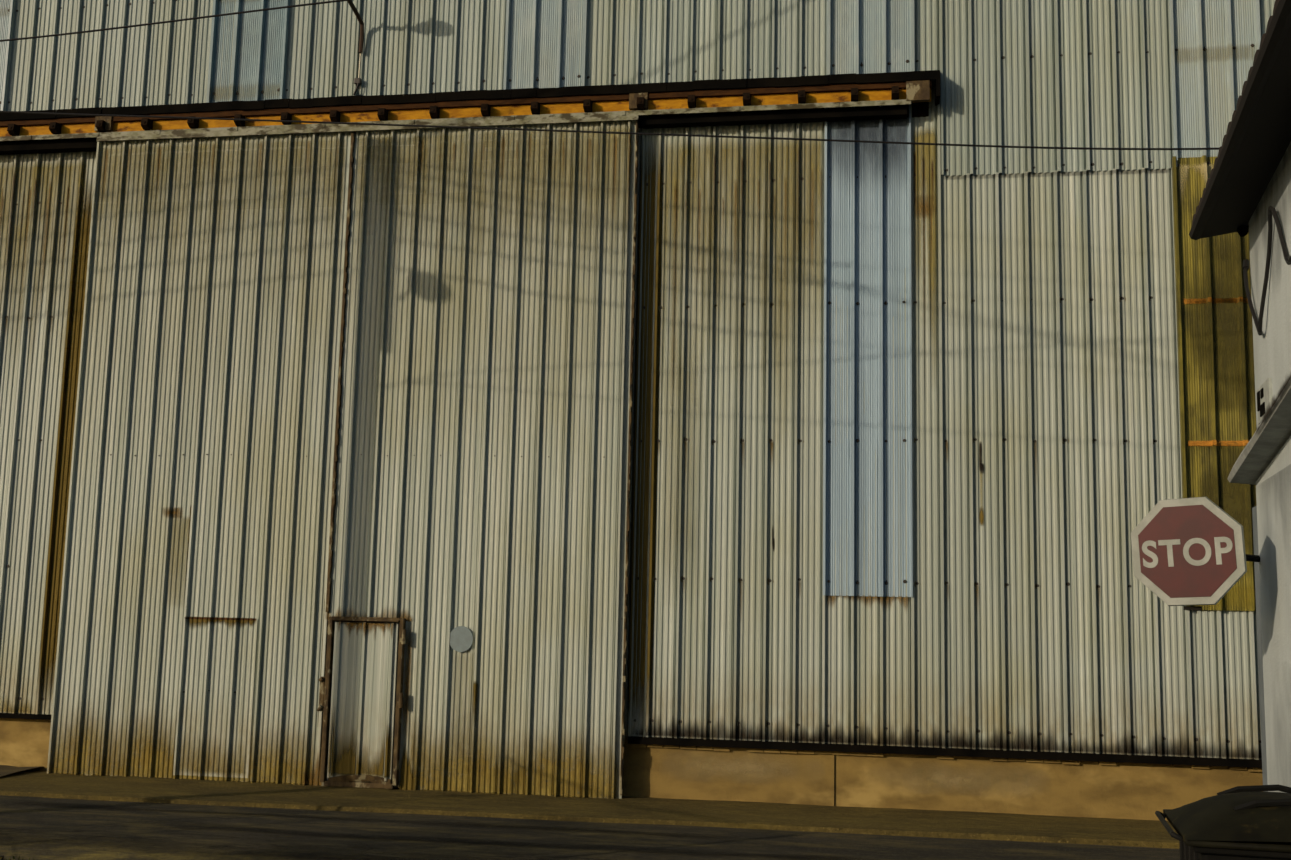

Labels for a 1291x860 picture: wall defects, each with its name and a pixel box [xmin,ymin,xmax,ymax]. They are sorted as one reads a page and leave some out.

rust [359,135,463,187]
rust [474,131,568,172]
rust [914,131,936,316]
rust [0,163,92,689]
rust [584,129,821,710]
rust [167,506,192,564]
rust [303,719,416,791]